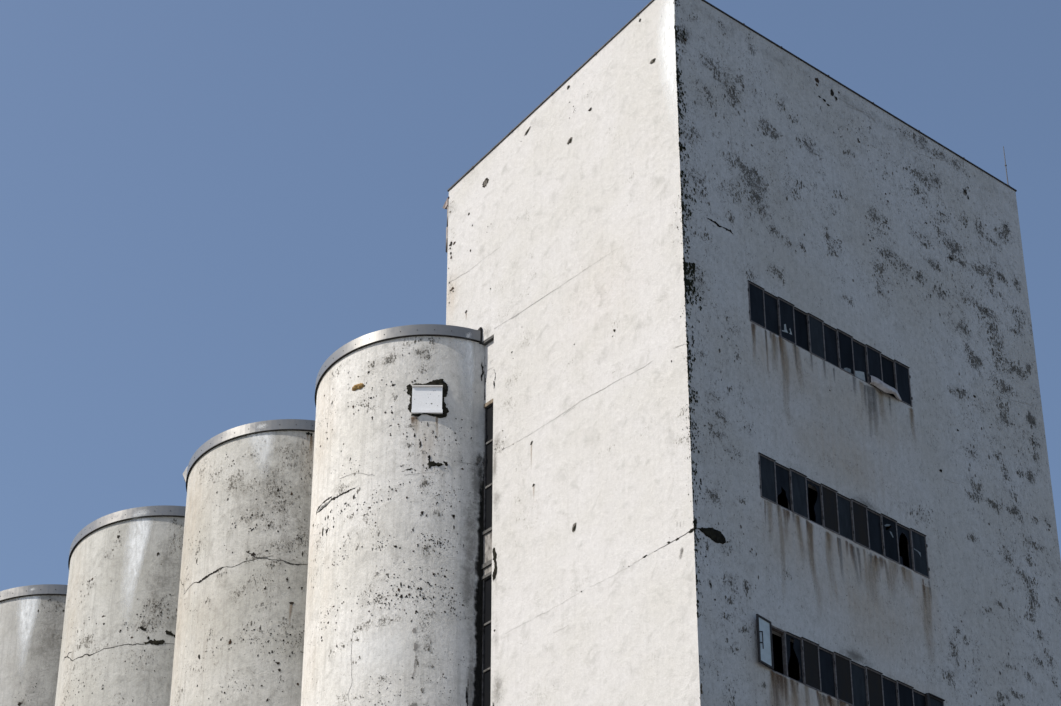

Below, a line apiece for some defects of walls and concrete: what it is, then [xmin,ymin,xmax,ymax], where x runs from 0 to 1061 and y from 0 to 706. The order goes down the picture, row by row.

crack [316,473,372,513]
spalling [182,361,478,706]
spalling [695,517,728,544]
crack [181,552,307,594]
crack [64,643,139,661]